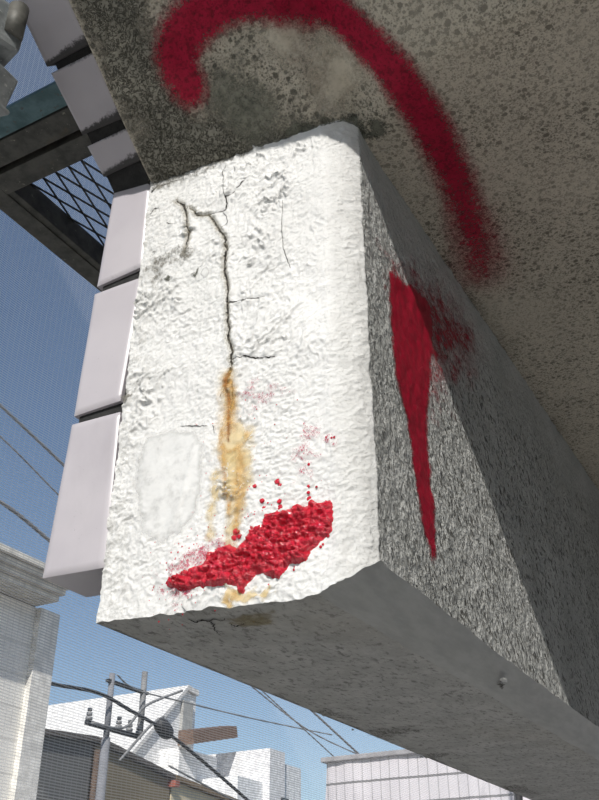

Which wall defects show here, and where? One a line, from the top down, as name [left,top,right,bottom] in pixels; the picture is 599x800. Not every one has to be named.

leakage [72,0,388,190]
crack [150,168,275,430]
rust [209,376,252,543]
rust [222,585,270,608]